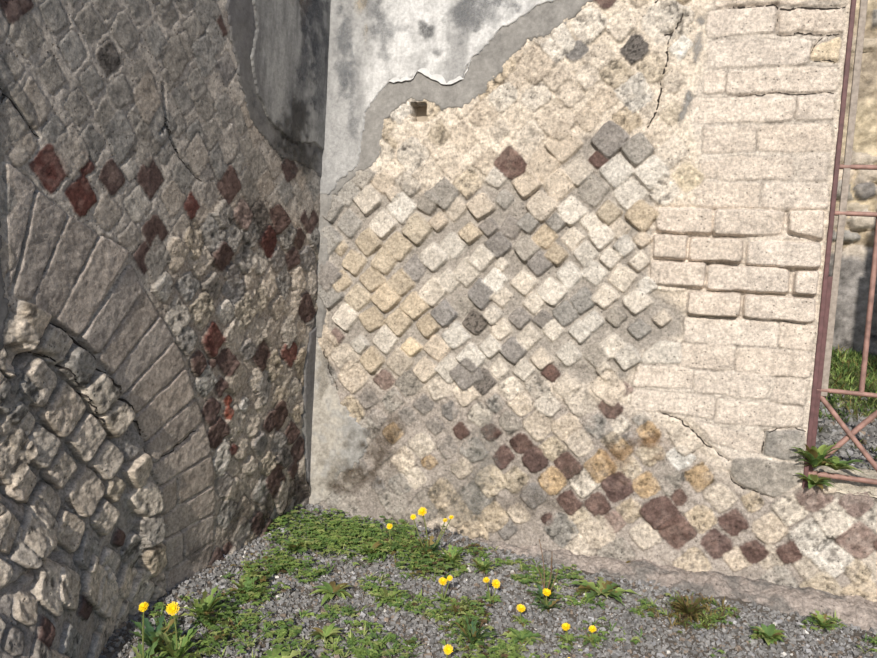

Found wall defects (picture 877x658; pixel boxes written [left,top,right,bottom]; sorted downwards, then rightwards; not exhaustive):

peeling [250,0,555,195]
crack [647,13,683,128]